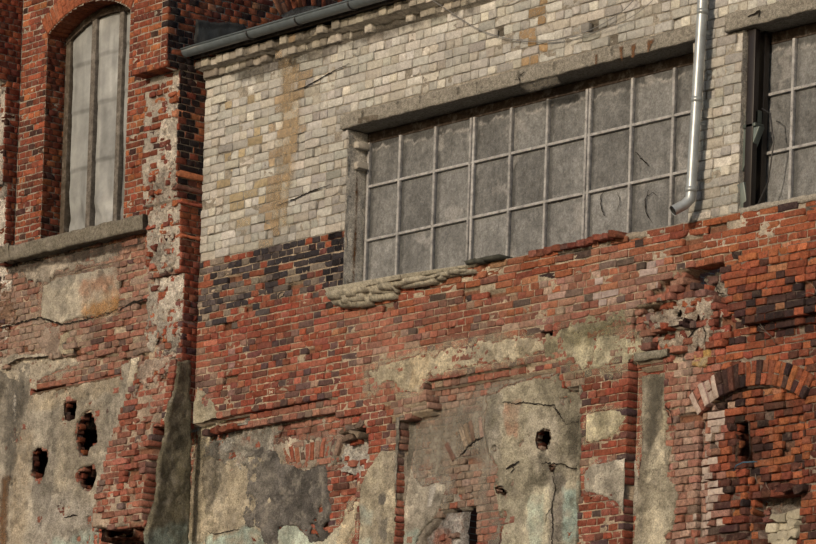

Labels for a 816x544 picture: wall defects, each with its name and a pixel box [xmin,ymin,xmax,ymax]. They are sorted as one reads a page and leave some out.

peeling [0,78,471,544]
peeling [366,272,728,398]
corrosion [0,477,10,544]
crack [504,401,579,425]
crack [541,462,577,544]
peeling [477,372,679,544]